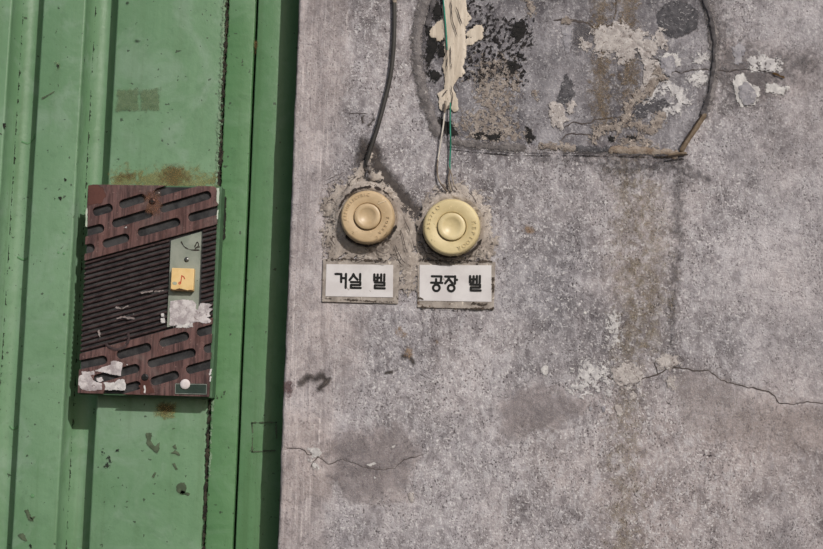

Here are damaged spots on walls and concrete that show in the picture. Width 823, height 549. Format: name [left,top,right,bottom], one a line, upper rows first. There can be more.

peeling [429,18,443,42]
spalling [451,25,577,150]
peeling [578,18,710,149]
peeling [731,42,790,108]
crack [597,354,823,405]
crack [287,448,427,470]